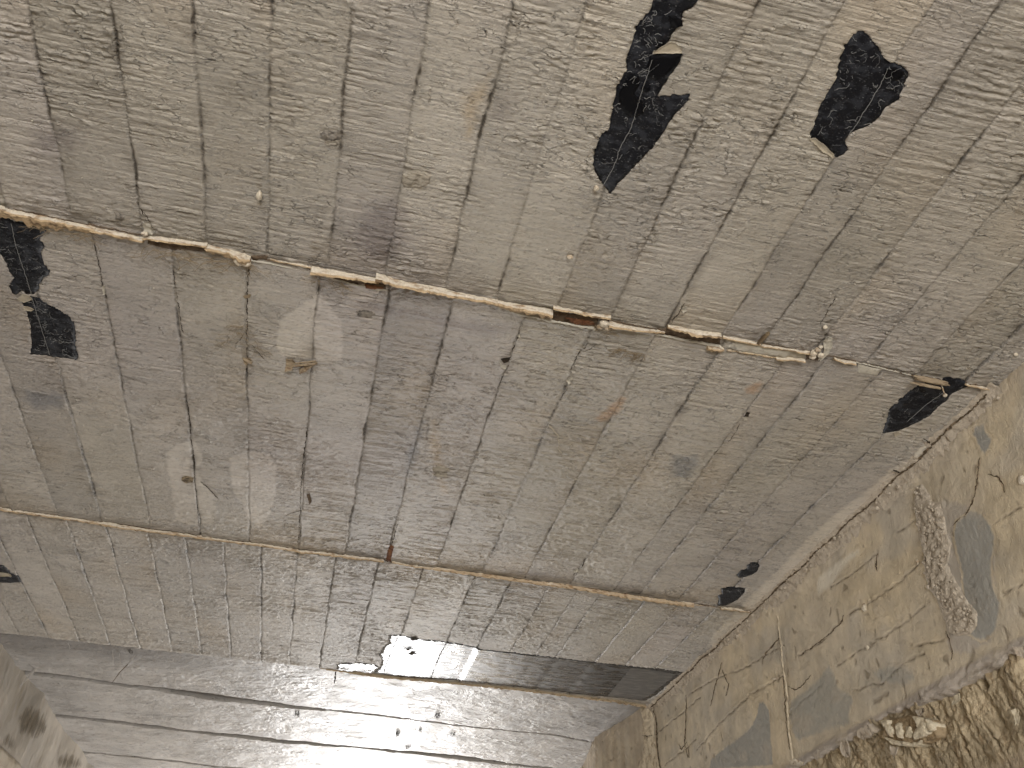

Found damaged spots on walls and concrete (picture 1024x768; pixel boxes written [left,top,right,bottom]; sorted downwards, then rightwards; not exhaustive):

peeling [593,0,698,194]
peeling [810,31,908,158]
peeling [0,217,79,361]
crack [94,245,106,295]
crack [138,204,155,236]
crack [239,268,263,372]
crack [497,329,521,388]
crack [560,344,592,400]
peeling [882,377,968,437]
peeling [718,562,760,606]
crack [646,382,1005,760]
peeling [334,634,683,768]